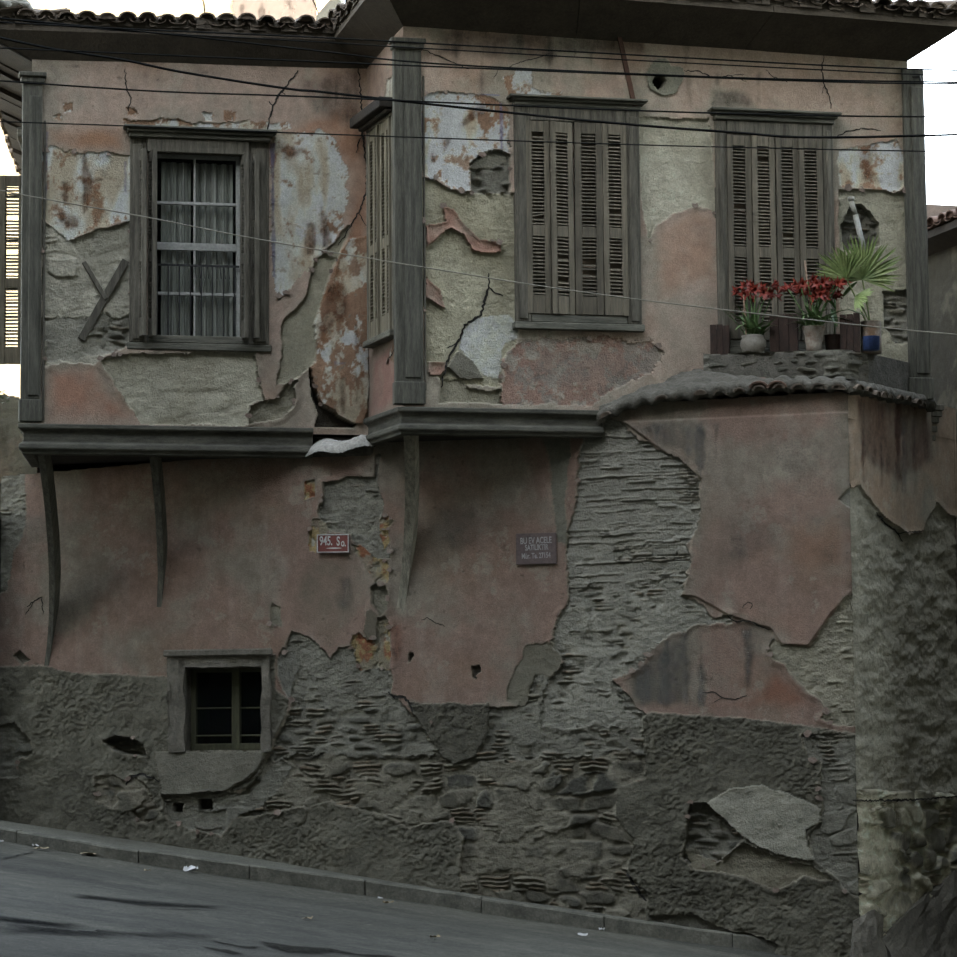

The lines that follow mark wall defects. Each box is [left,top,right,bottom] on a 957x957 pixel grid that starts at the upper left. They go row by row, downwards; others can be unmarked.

flaking render [41,107,357,428]
crack [441,273,503,387]
flaking render [422,71,665,407]
crack [821,58,832,105]
flaking render [93,417,777,949]
flaking render [683,484,957,936]